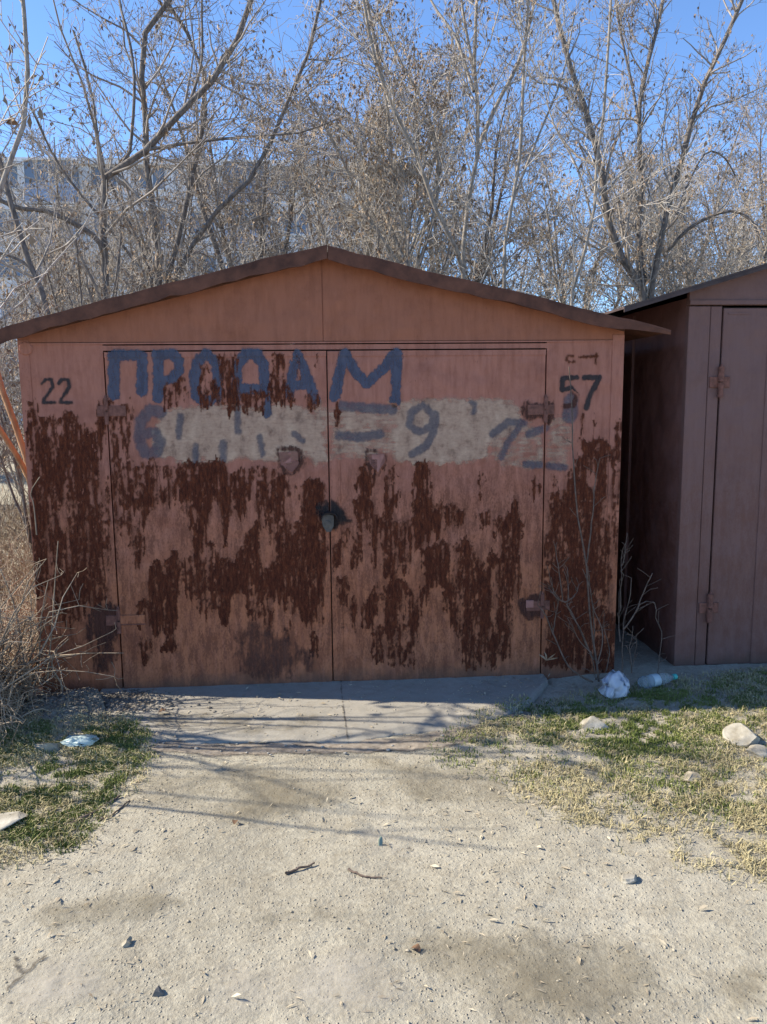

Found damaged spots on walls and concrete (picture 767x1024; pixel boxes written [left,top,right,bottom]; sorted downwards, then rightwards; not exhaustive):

corrosion [277,445,305,475]
corrosion [86,602,118,673]